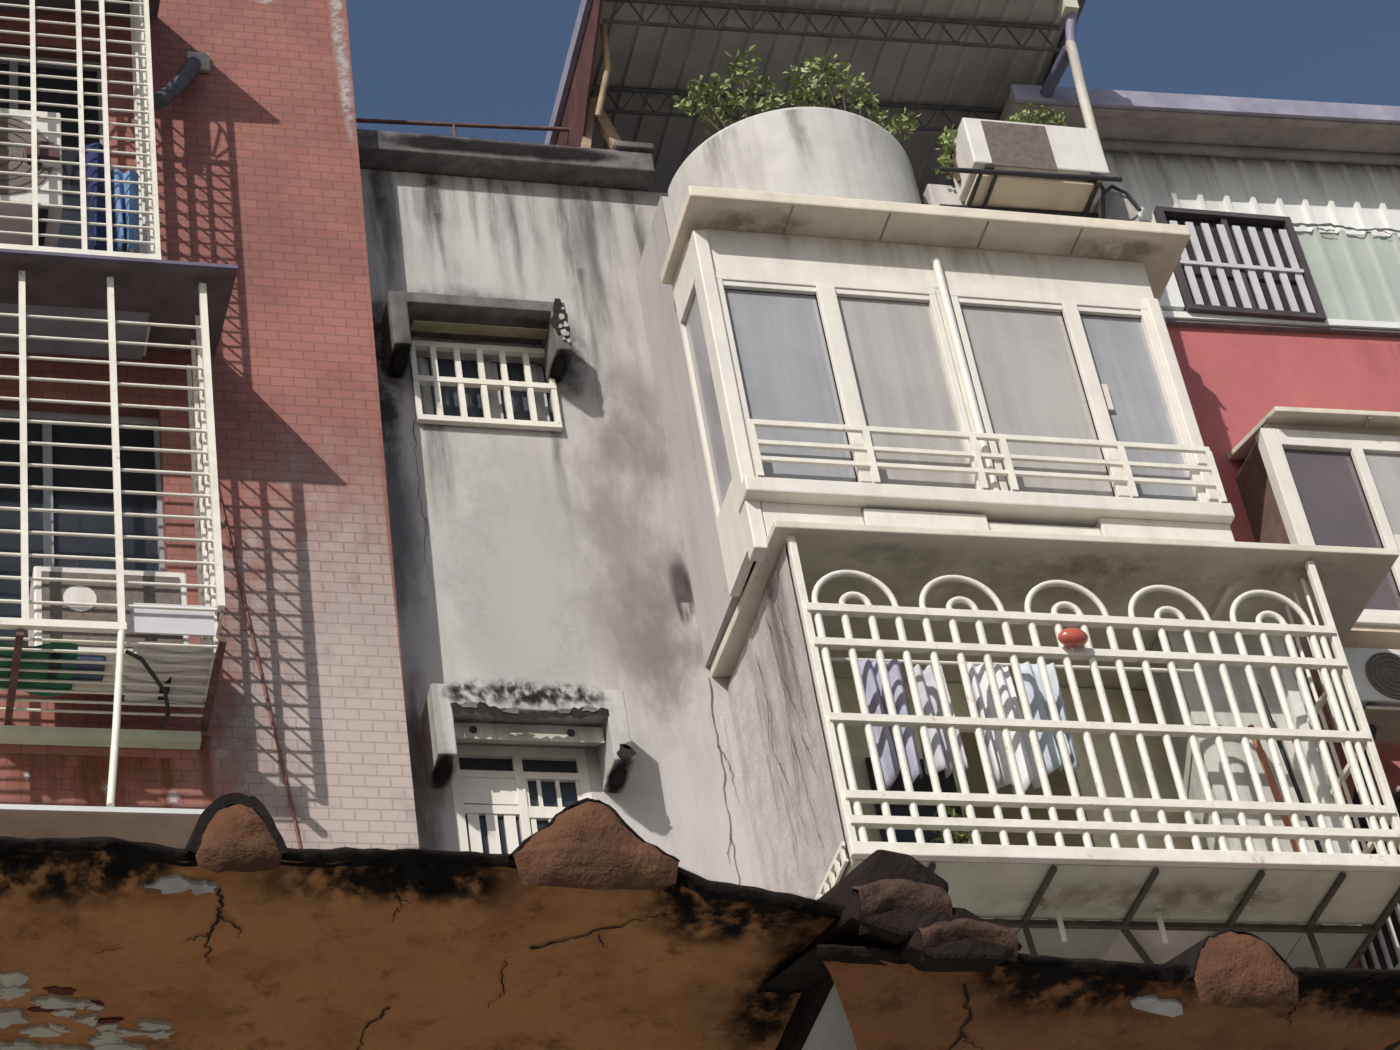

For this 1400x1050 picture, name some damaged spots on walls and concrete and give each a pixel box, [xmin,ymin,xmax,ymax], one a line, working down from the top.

water stain [373,311,411,440]
water stain [671,563,693,621]
water stain [448,683,595,705]
crack [756,583,821,878]
water stain [606,761,631,792]
crack [709,677,740,885]
peeling [144,874,217,896]
crack [186,889,242,963]
crack [488,913,674,1007]
water stain [662,873,839,1044]
peeling [0,971,175,1050]
peeling [1130,994,1183,1017]